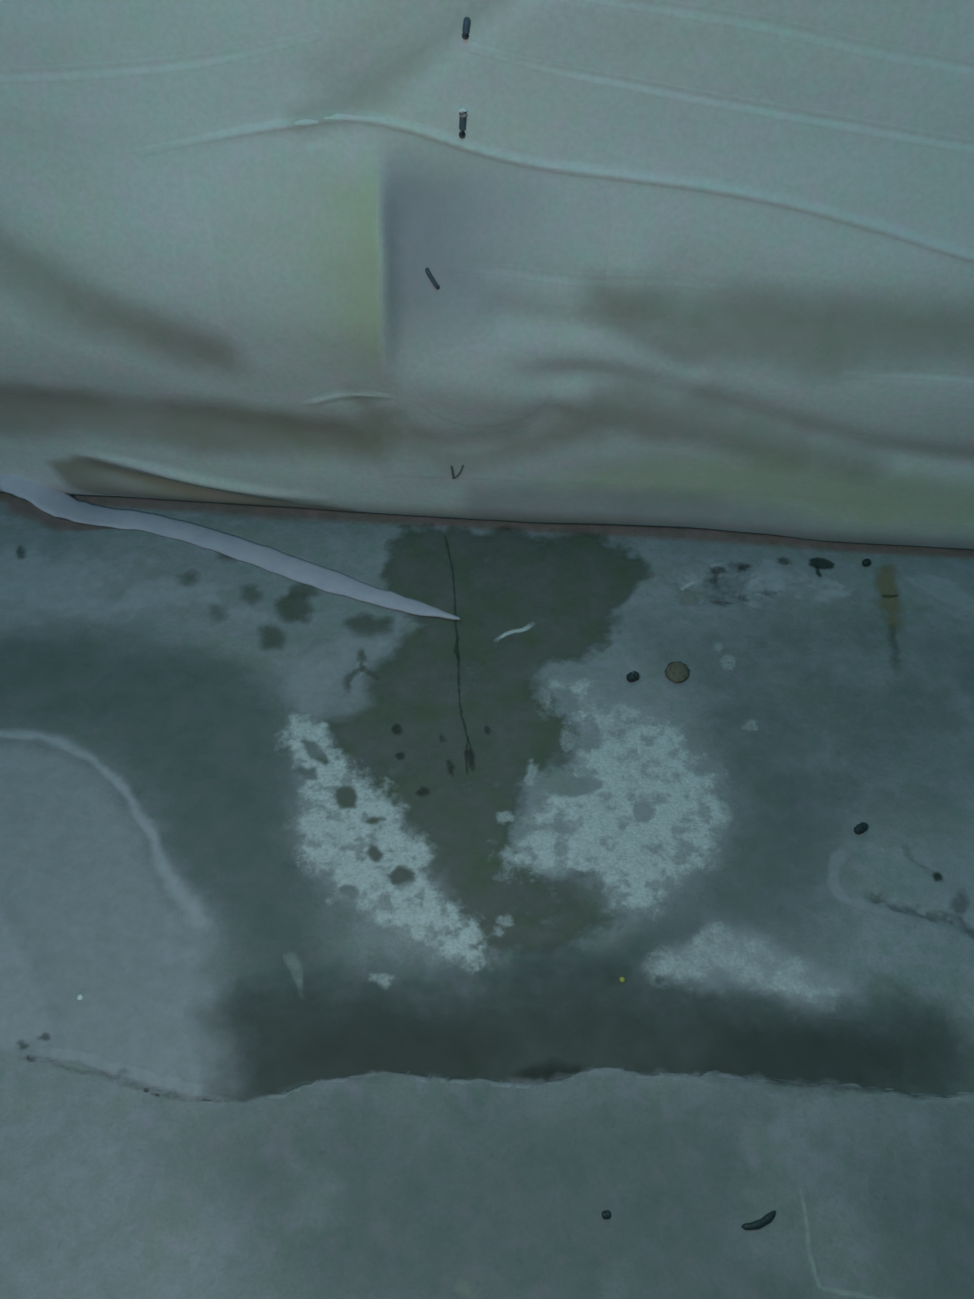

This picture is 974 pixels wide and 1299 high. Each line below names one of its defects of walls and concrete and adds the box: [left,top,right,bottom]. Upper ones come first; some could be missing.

peeling [0,474,460,620]
damp [0,528,956,1097]